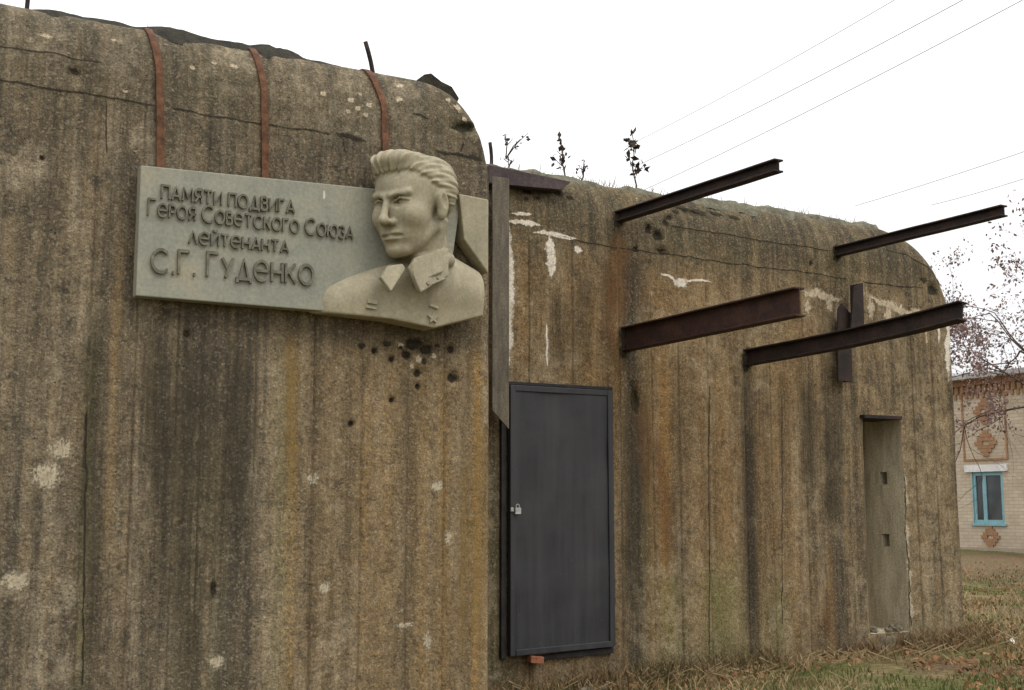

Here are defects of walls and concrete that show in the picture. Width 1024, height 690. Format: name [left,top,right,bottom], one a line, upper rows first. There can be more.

spalling [358,338,453,389]
crack [81,411,89,685]